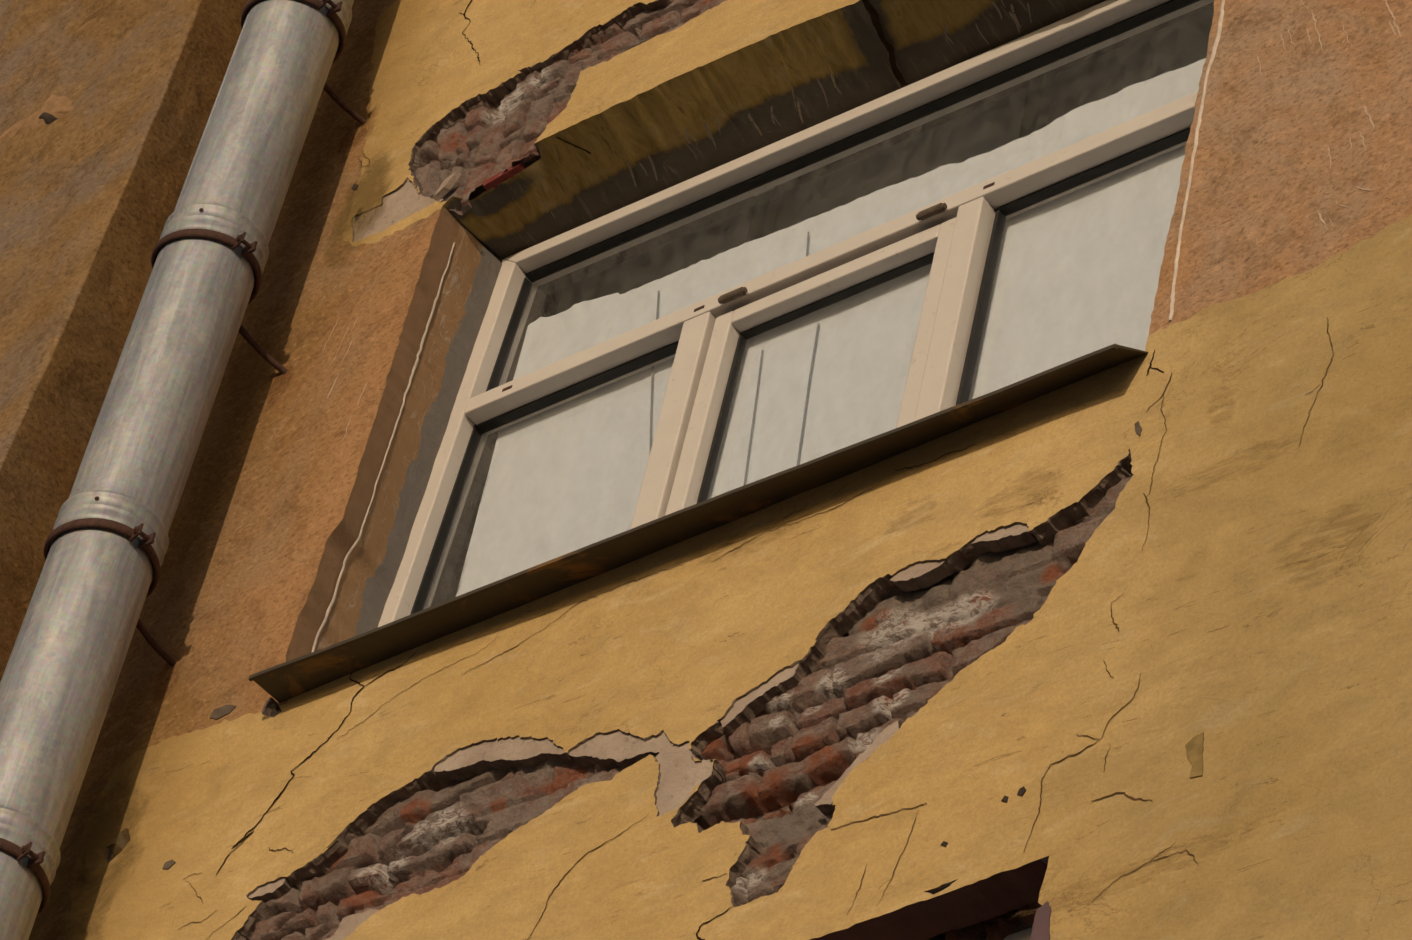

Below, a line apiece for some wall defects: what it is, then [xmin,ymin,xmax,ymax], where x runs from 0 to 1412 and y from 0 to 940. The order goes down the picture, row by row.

crack [461,0,480,62]
flaking render [353,0,727,241]
crack [1142,349,1172,551]
crack [1298,318,1334,447]
peeling [209,705,237,720]
crack [181,444,974,940]
flaking render [249,474,1133,940]
crack [1024,662,1152,851]
peeling [1185,732,1204,779]